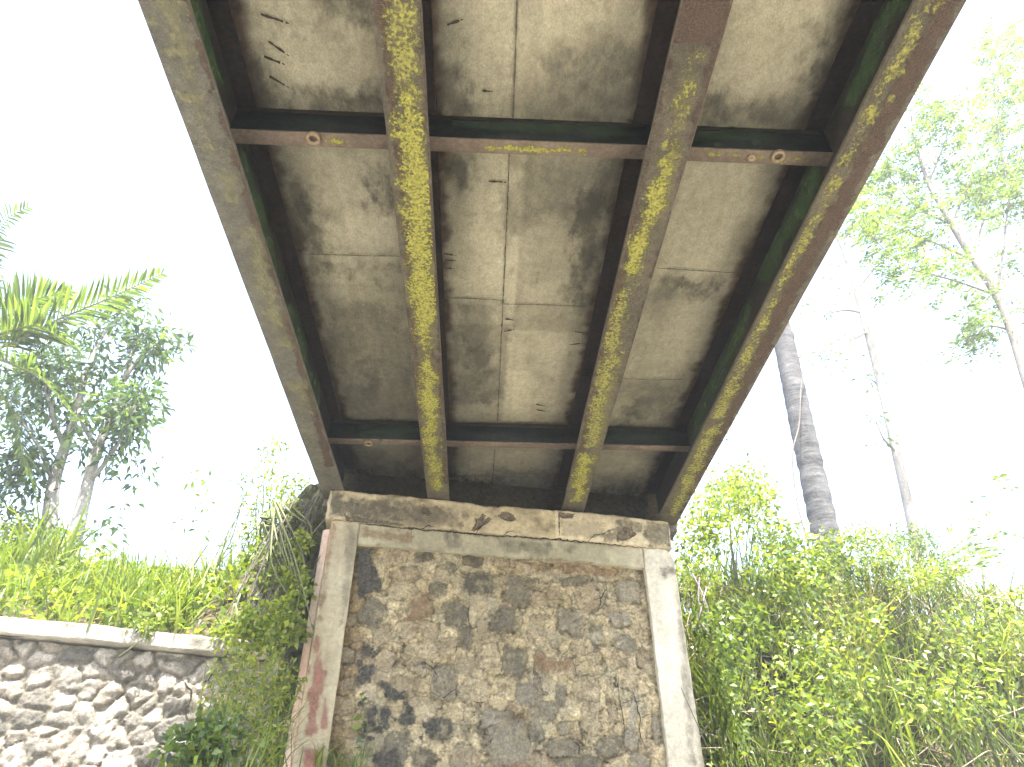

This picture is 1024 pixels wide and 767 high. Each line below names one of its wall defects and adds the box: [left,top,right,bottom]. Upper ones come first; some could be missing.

corrosion [680,0,961,515]
spalling [471,511,516,532]
crack [341,514,669,550]
spalling [617,526,637,541]